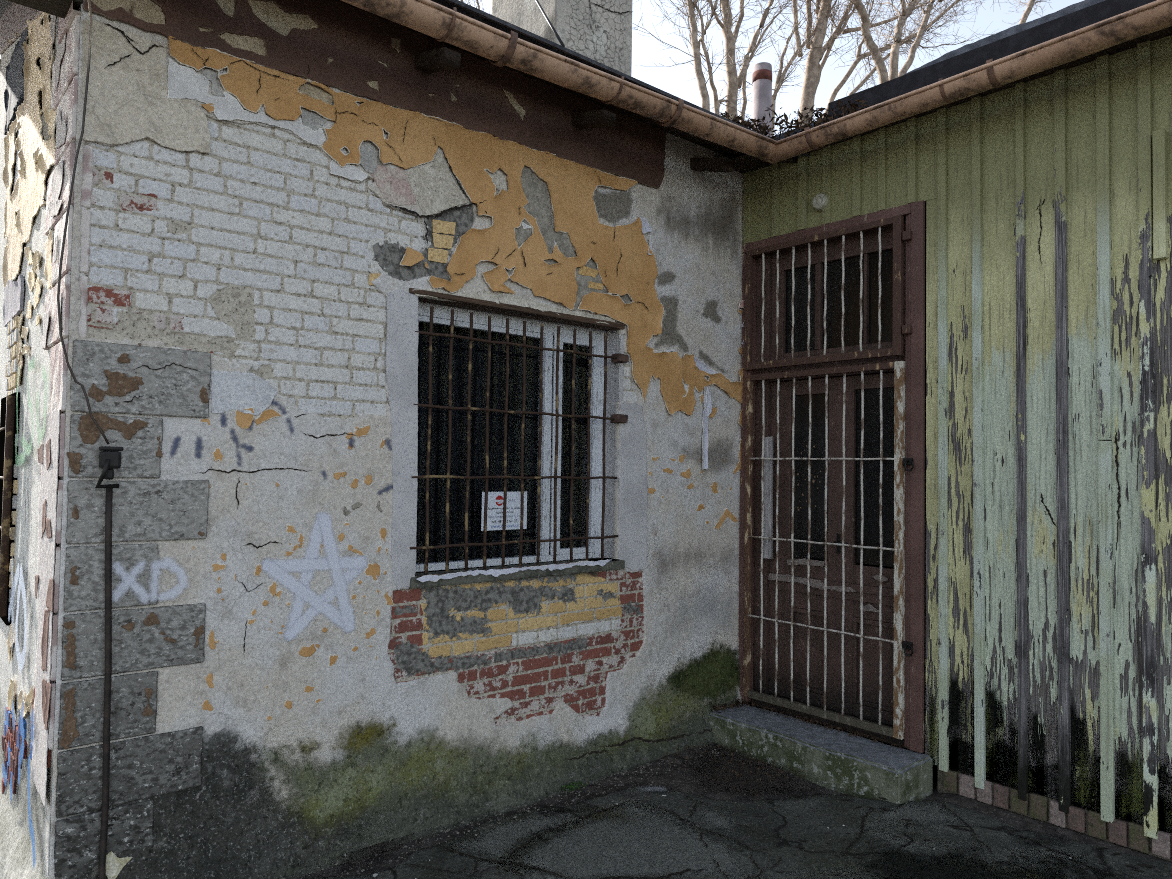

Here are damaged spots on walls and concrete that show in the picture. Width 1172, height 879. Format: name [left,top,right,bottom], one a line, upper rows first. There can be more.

crack [567,0,634,72]
flaking render [2,0,745,807]
peeling [926,47,1142,808]
peeling [1151,35,1172,771]
water stain [0,711,46,879]
water stain [66,691,739,879]
crack [405,794,782,879]
crack [567,729,712,760]
water stain [949,677,1101,813]
water stain [1115,752,1144,826]
water stain [1158,763,1172,834]